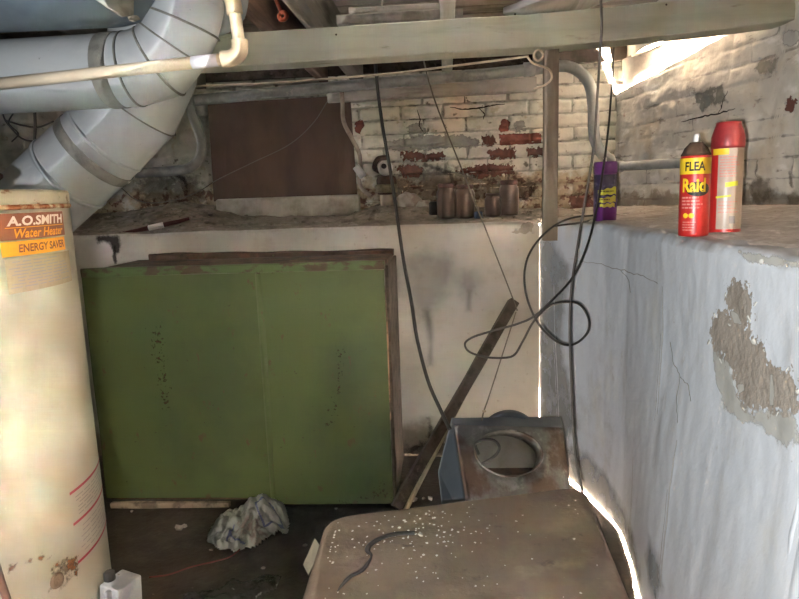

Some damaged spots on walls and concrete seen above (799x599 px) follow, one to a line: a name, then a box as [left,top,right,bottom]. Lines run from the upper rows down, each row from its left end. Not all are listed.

flaking render [784,96,799,113]
flaking render [395,149,446,178]
flaking render [455,117,543,179]
damp [396,164,538,202]
peeling [707,277,799,447]